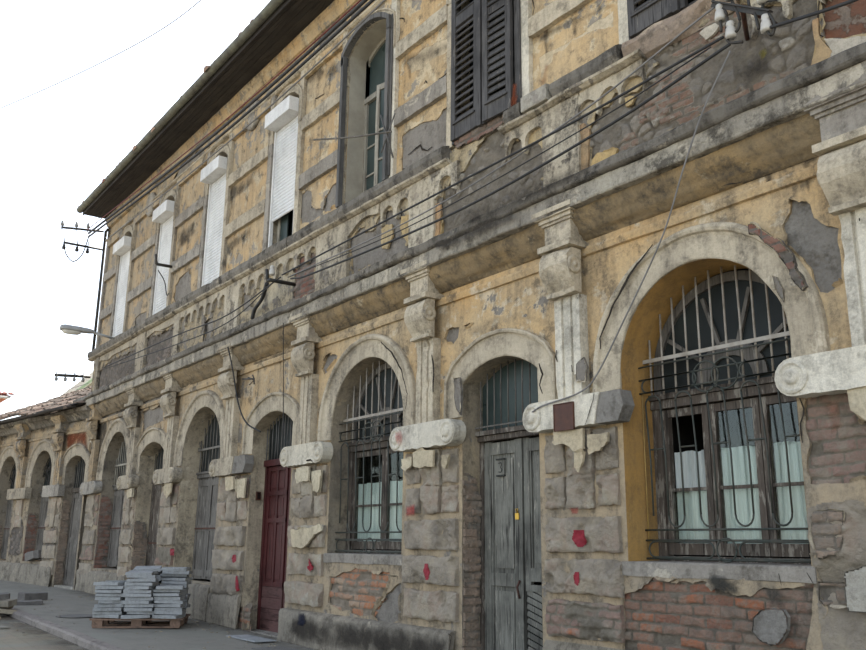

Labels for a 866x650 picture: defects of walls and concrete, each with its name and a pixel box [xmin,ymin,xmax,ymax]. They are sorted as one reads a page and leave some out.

flaking render [580,0,866,169]
peeling [301,181,336,223]
flaking render [403,104,544,236]
peeling [748,196,843,302]
flaking render [805,386,866,485]
flaking render [329,568,402,622]
flaking render [624,500,866,650]